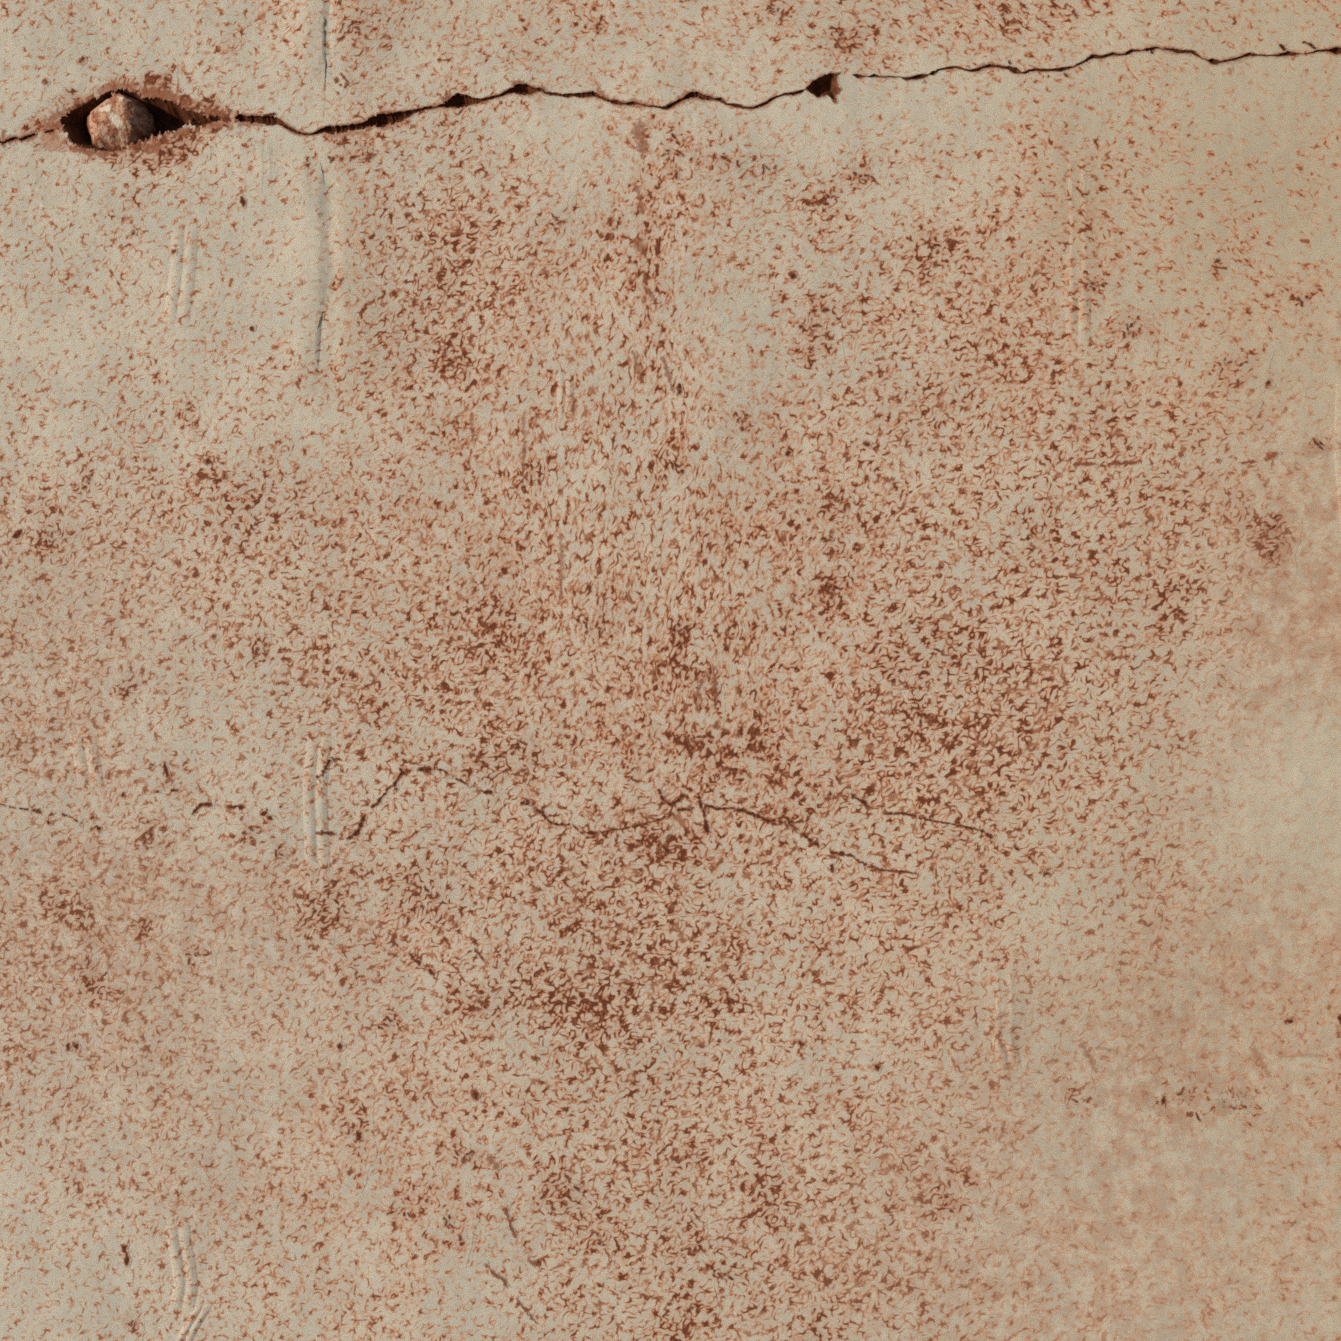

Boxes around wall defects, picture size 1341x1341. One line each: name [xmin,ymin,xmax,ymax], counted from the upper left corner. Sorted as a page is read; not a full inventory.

hole [14,59,255,182]
crack [234,79,805,141]
crack [852,40,1341,84]
corrosion [597,76,884,501]
corrosion [443,372,616,696]
corrosion [661,592,780,801]
crack [0,761,285,834]
corrosion [221,802,470,961]
crack [314,756,918,876]
crack [821,789,1053,879]
corrosion [435,958,655,1053]
corrosion [332,1079,498,1269]